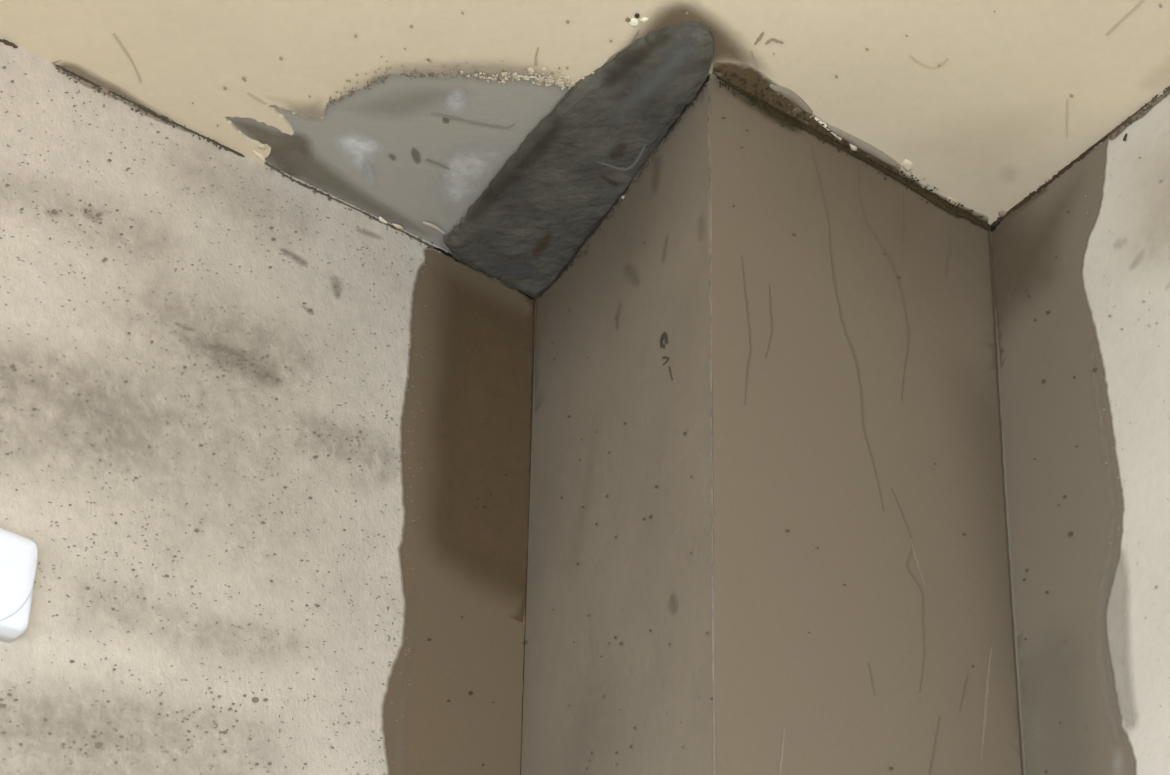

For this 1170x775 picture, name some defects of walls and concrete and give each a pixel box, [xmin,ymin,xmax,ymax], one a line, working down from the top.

leakage [279,69,567,123]
spalling [217,56,572,253]
leakage [442,150,500,202]
spalling [158,687,268,741]